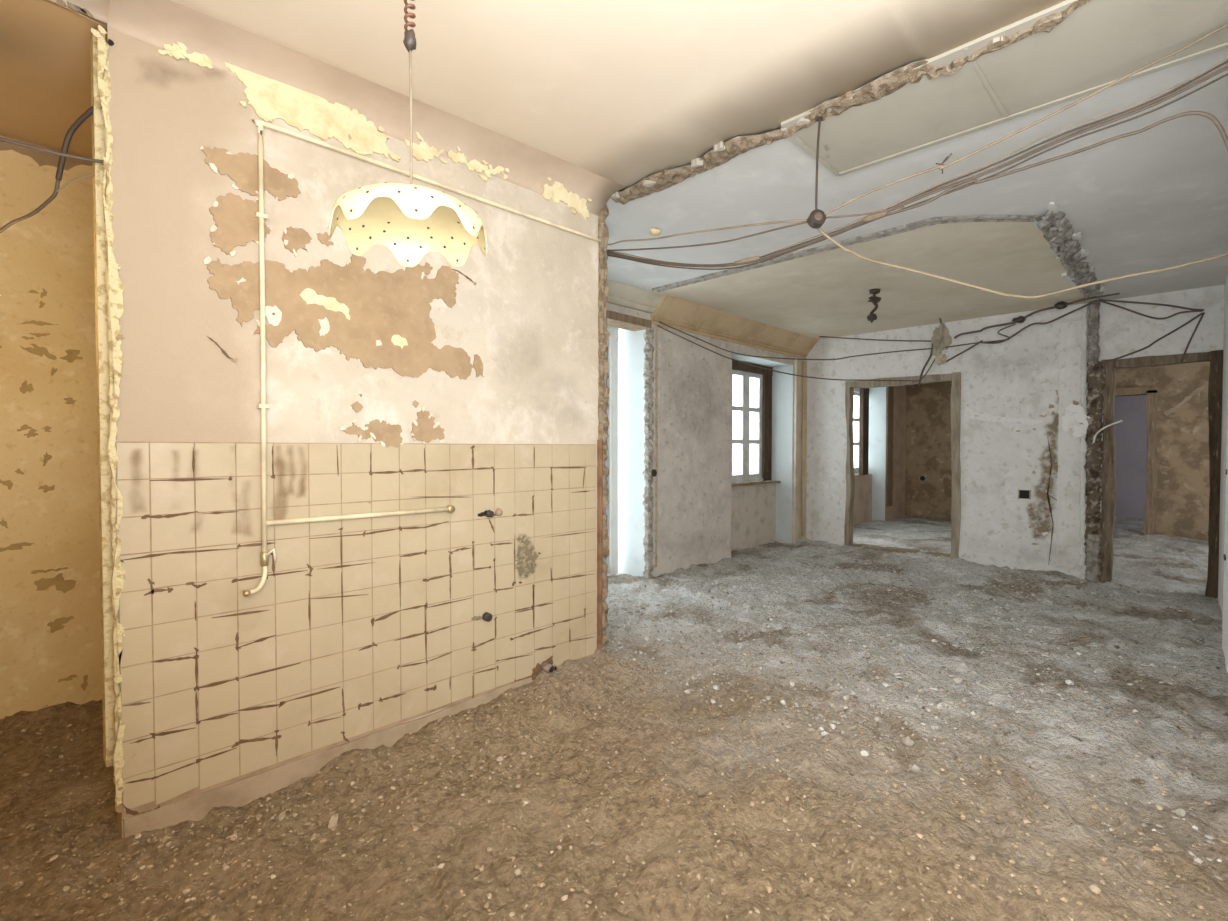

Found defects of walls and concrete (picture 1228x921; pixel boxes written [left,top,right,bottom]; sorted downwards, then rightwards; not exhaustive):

peeling [158,41,509,182]
flaking render [0,25,125,813]
peeling [200,146,483,380]
peeling [339,394,445,448]
flaking render [541,0,1091,653]
flaking render [1033,202,1106,299]
crack [120,445,595,816]
spalling [510,528,541,586]